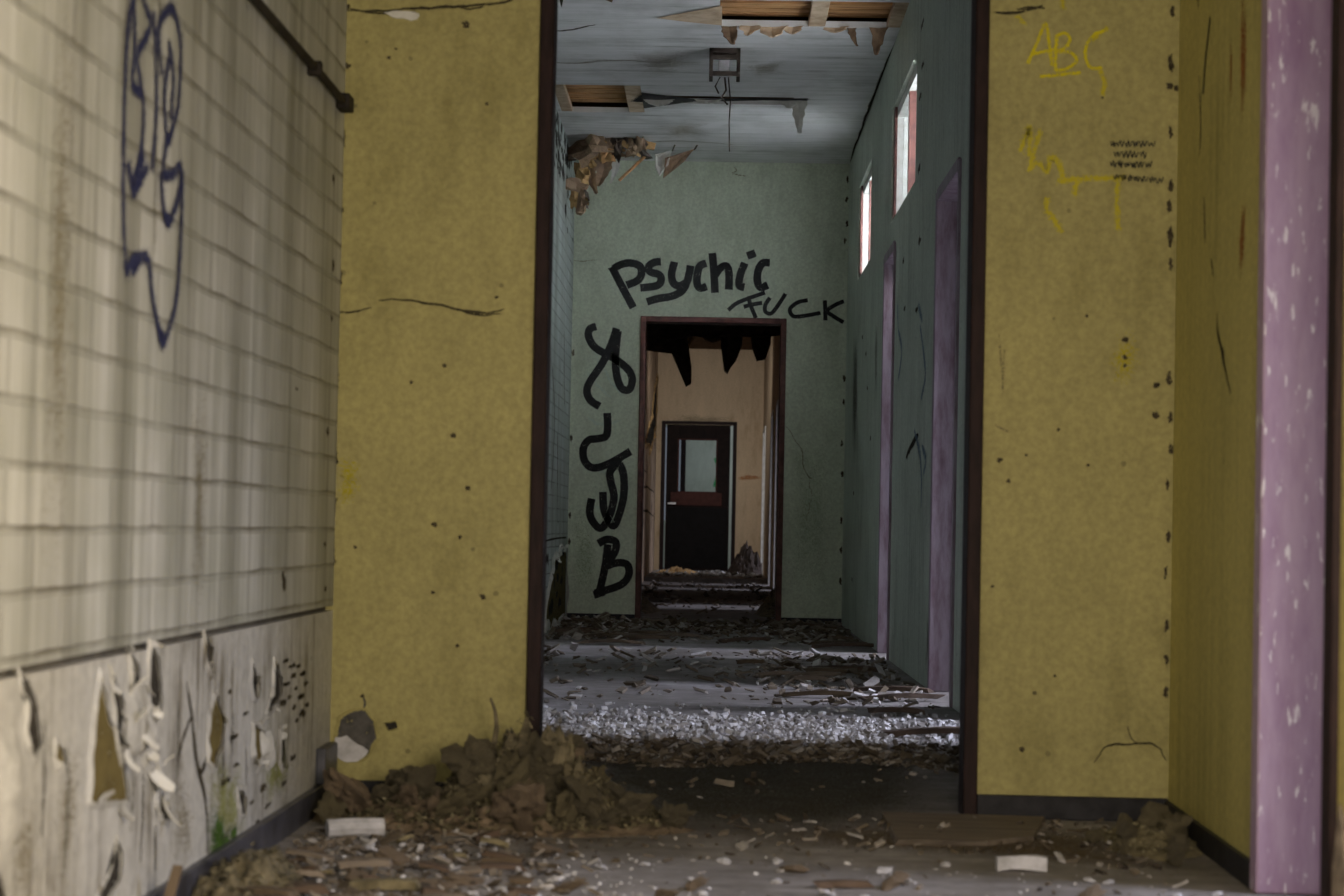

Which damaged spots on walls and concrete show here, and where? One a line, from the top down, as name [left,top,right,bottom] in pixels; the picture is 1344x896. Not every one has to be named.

crack [347,0,512,21]
peeling [655,145,698,178]
crack [340,298,505,316]
peeling [16,666,67,773]
peeling [87,639,164,821]
peeling [202,628,309,823]
flaking render [332,694,400,762]
crack [1094,726,1166,762]
peeling [153,790,172,828]
peeling [96,834,124,896]